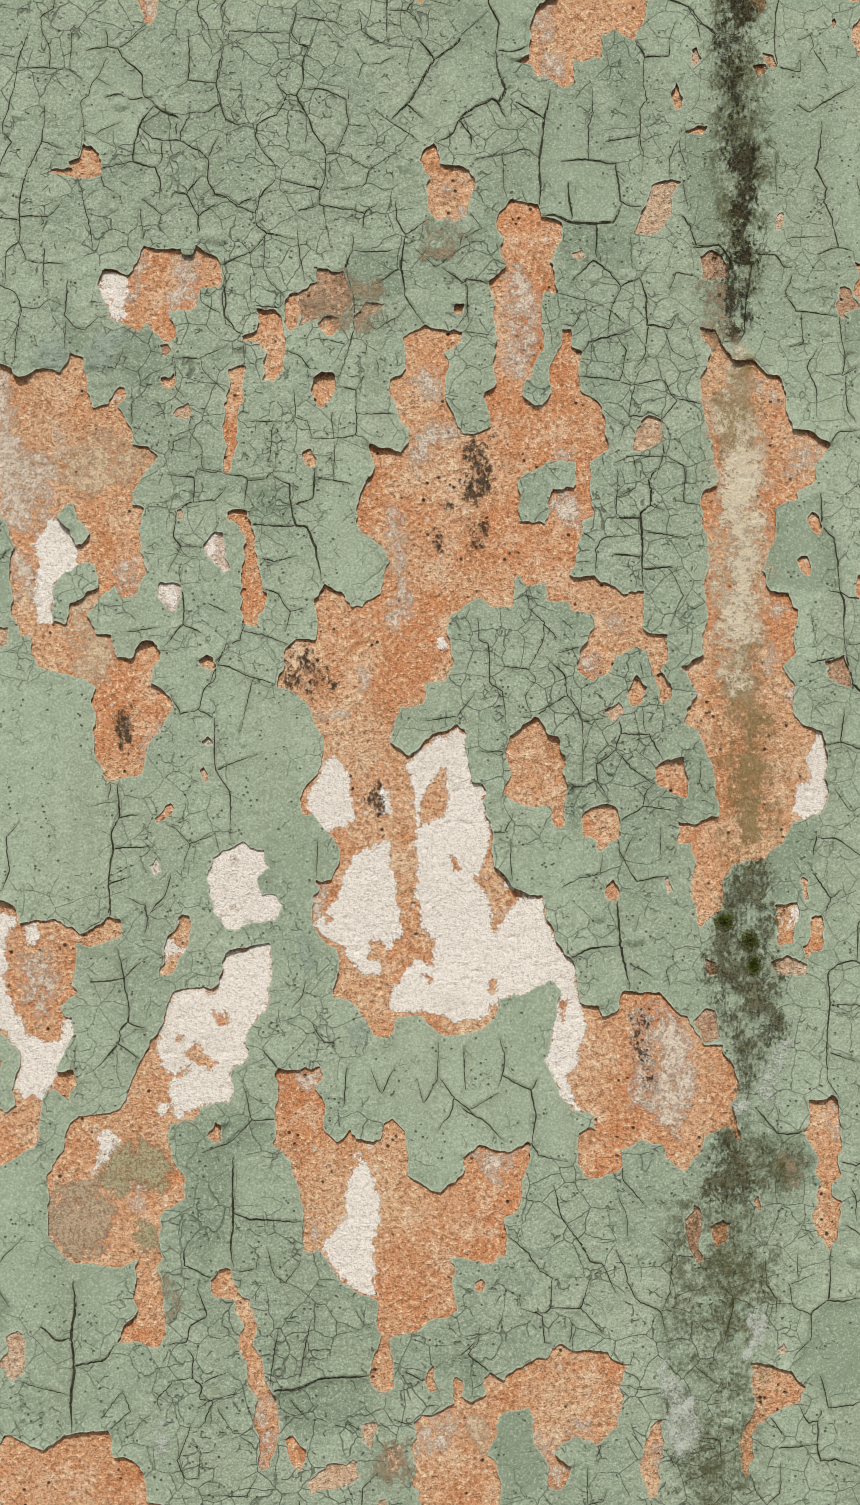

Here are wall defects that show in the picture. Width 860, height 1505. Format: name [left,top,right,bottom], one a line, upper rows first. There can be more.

peeling [0,353,181,782]
peeling [277,199,831,1179]
damp [695,0,778,862]
peeling [46,841,282,1348]
crack [23,1087,369,1498]
peeling [273,1066,531,1393]
crack [292,981,673,1344]
efflorescence [657,1360,704,1459]
crack [586,1162,860,1505]
damp [700,1029,805,1203]
efflorescence [742,1303,769,1361]
crack [757,1110,802,1135]